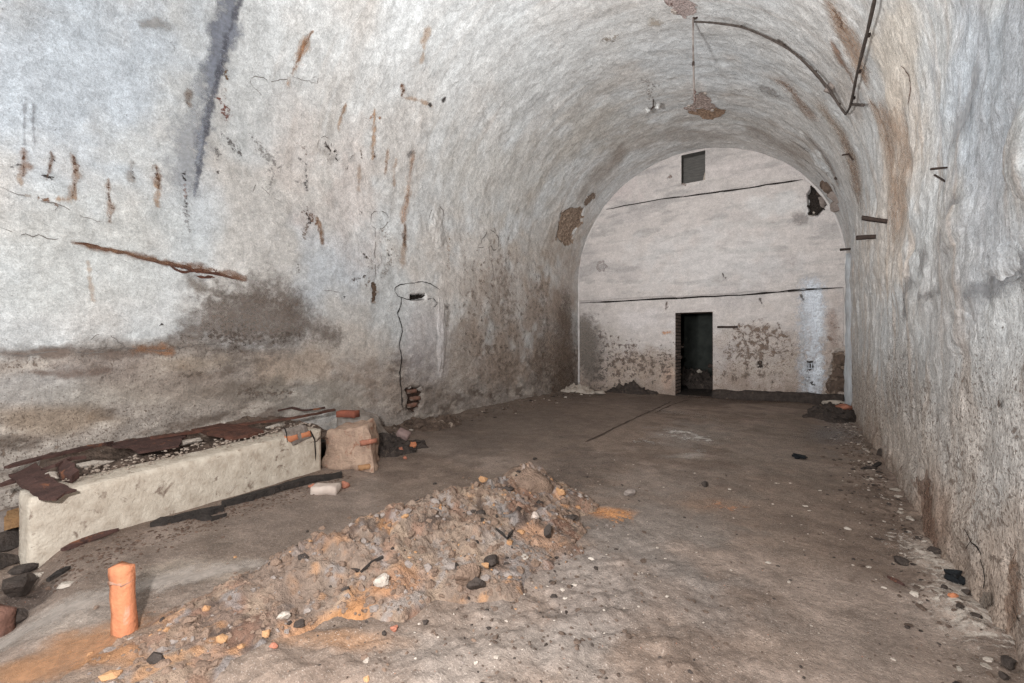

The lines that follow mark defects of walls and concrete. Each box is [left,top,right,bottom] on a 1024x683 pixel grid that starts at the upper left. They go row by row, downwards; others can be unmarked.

peeling [665,0,698,19]
corrosion [297,31,313,61]
peeling [683,92,717,112]
corrosion [38,155,79,206]
spalling [807,180,840,217]
flaking render [555,193,596,246]
corrosion [74,243,246,281]
water stain [35,279,337,378]
water stain [4,348,70,358]
spalling [405,386,422,412]